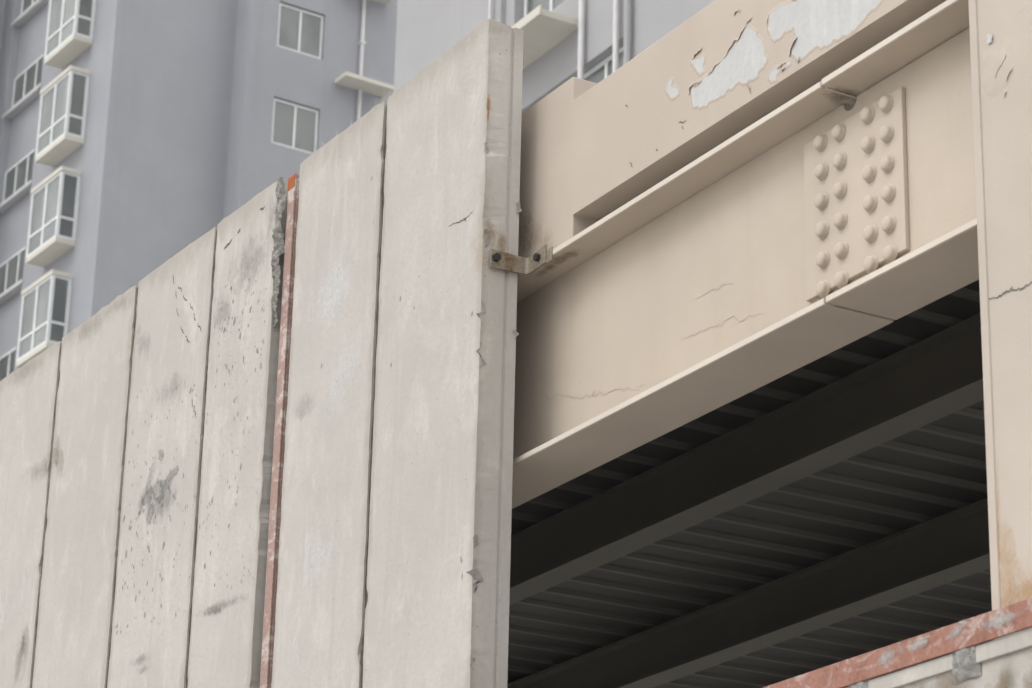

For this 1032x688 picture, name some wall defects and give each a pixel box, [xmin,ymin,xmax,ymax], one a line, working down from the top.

peeling [665,0,884,111]
crack [988,282,1032,299]
spalling [460,557,484,592]